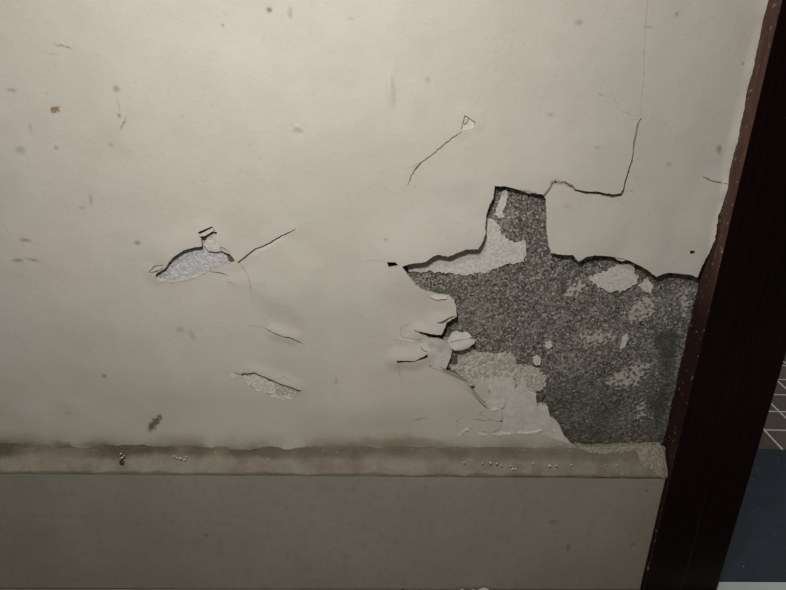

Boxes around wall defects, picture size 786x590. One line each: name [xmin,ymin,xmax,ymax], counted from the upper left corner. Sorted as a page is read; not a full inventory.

crack [545,0,648,198]
crack [407,132,461,184]
flaking render [149,226,234,283]
crack [209,229,295,300]
flaking render [392,186,702,480]
peeling [230,372,300,400]